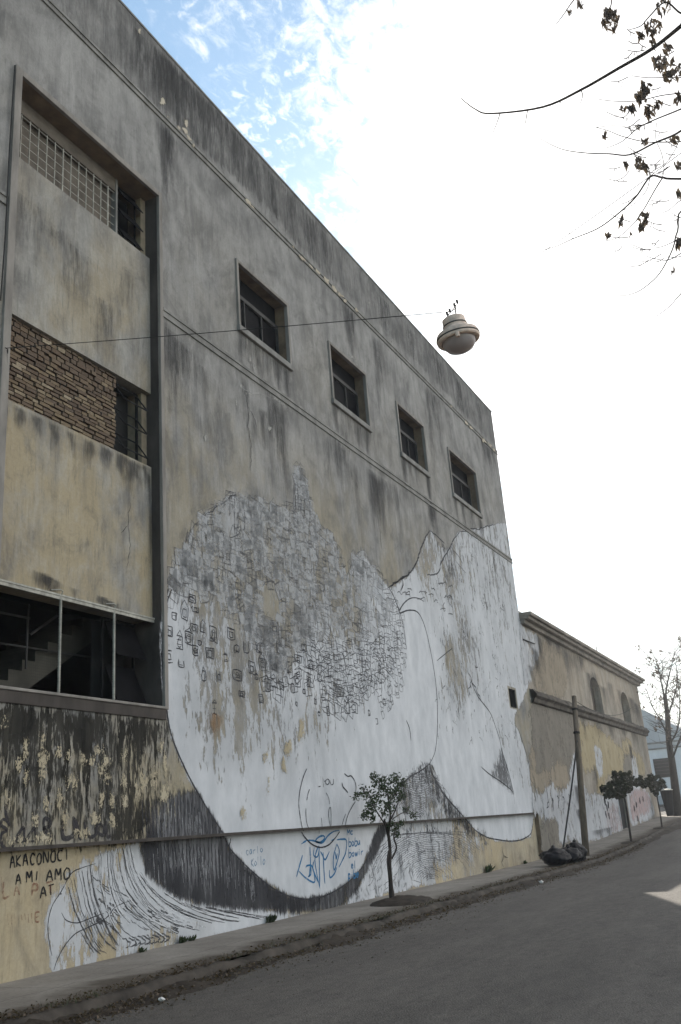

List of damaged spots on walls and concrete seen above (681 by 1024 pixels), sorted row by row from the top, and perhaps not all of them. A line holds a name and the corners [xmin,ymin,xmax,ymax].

water stain [161,127,170,172]
water stain [39,574,58,589]
peeling [6,731,171,847]
peeling [519,621,655,851]